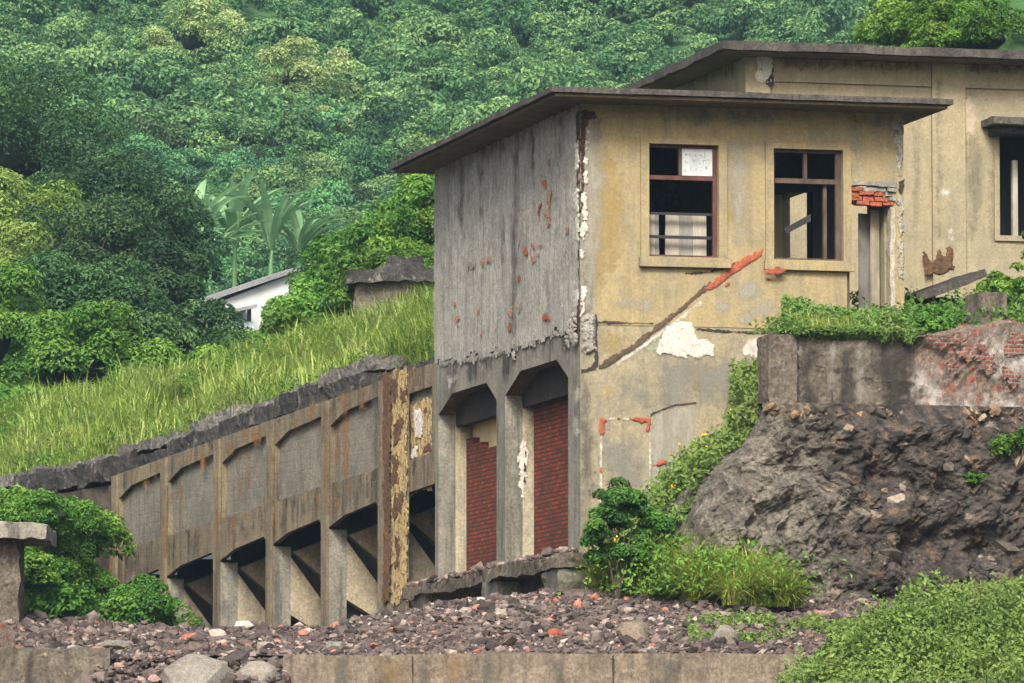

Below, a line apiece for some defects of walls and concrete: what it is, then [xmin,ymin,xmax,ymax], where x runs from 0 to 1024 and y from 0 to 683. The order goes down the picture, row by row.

spalling [537,179,551,228]
spalling [565,110,597,259]
crack [685,262,736,275]
flaking render [704,249,786,324]
corrosion [922,246,955,278]
spalling [436,286,588,367]
peeling [656,320,715,358]
crack [696,327,768,335]
flaking render [925,333,1024,393]
peeling [617,406,694,484]
peeling [382,366,432,606]